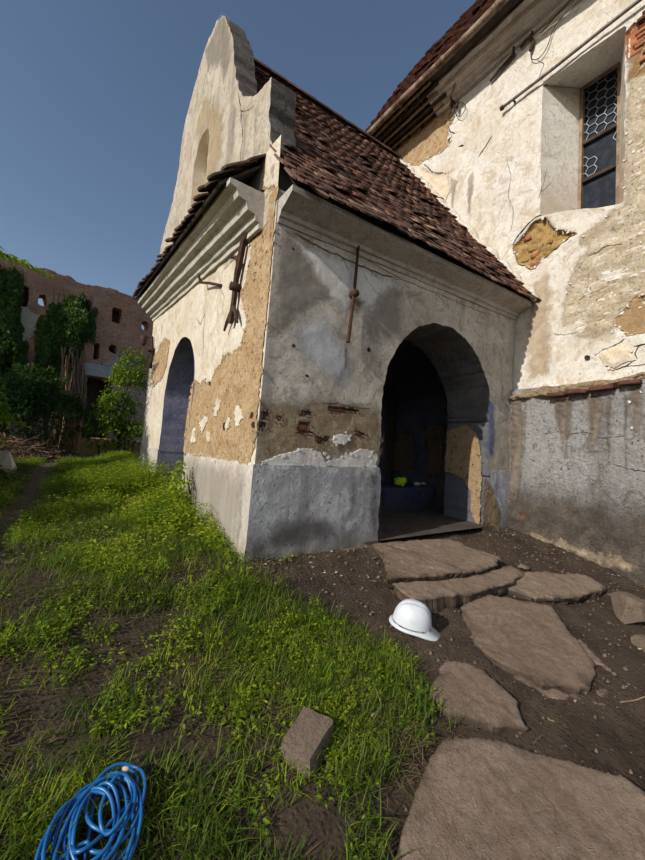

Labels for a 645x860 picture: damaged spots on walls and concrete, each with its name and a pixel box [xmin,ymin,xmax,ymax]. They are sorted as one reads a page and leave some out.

flaking render [512,10,645,338]
flaking render [151,337,170,387]
flaking render [183,184,380,465]
crack [596,339,645,370]
flaking render [444,425,500,531]